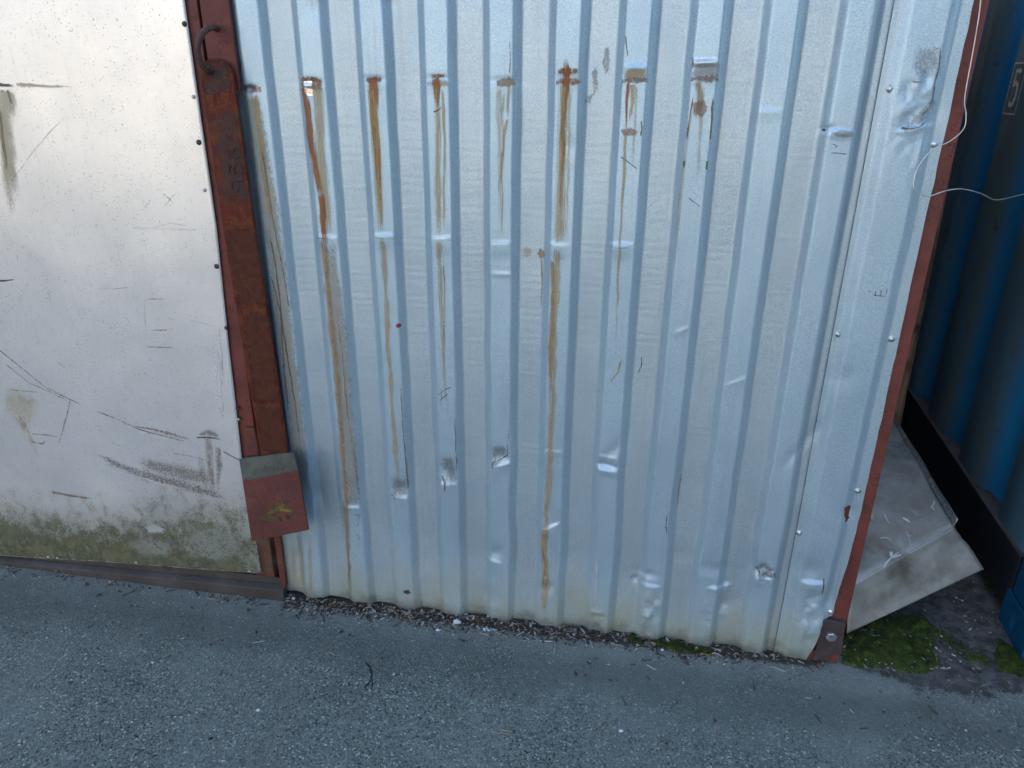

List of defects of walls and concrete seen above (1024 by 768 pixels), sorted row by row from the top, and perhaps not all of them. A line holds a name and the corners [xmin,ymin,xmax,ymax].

water stain [0,83,59,186]
corrosion [240,63,302,452]
corrosion [301,77,358,582]
corrosion [366,77,382,220]
corrosion [380,240,409,487]
corrosion [428,74,447,221]
corrosion [437,244,445,368]
corrosion [497,43,516,108]
corrosion [539,249,560,575]
corrosion [556,64,579,239]
corrosion [617,69,647,301]
corrosion [686,75,718,140]